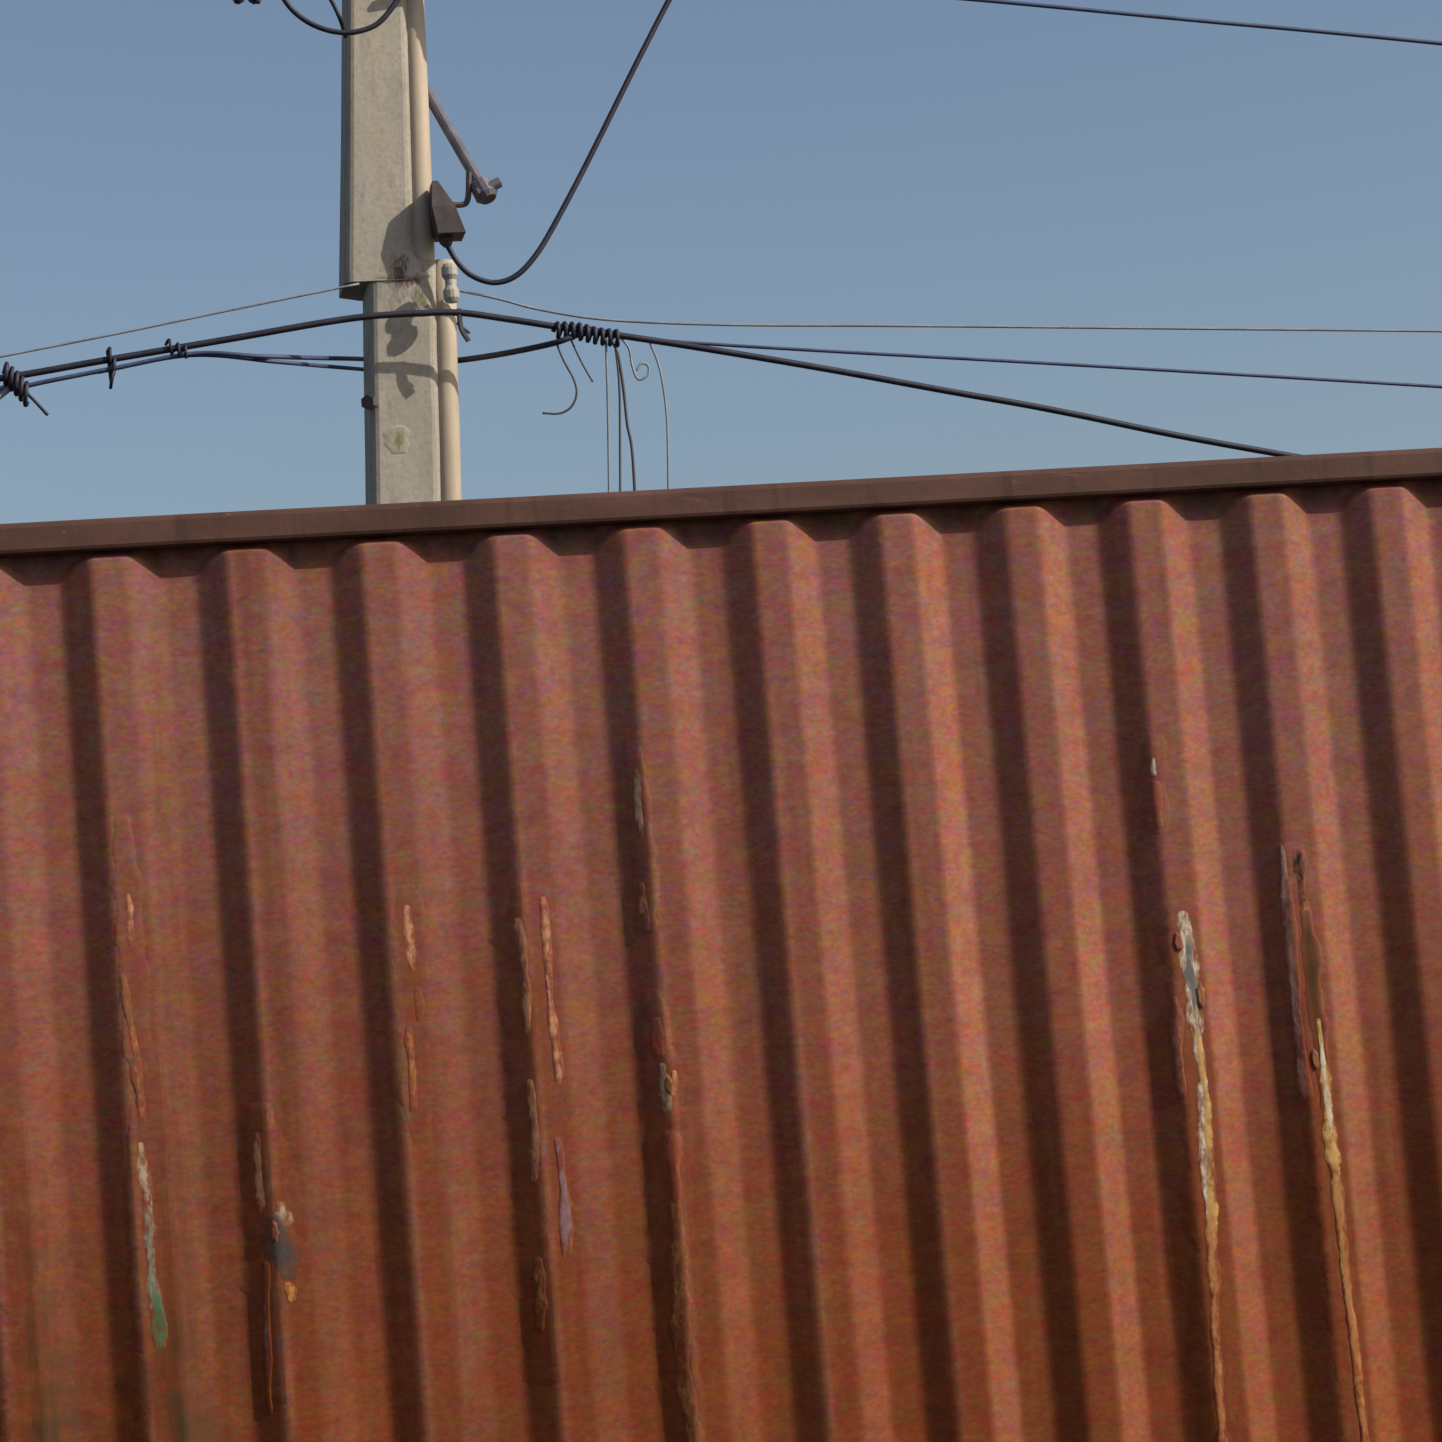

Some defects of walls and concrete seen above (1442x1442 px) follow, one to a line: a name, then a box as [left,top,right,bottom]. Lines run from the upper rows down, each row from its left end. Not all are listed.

peeling [232,1101,318,1416]
corrosion [1155,898,1251,1442]
corrosion [1267,842,1385,1442]